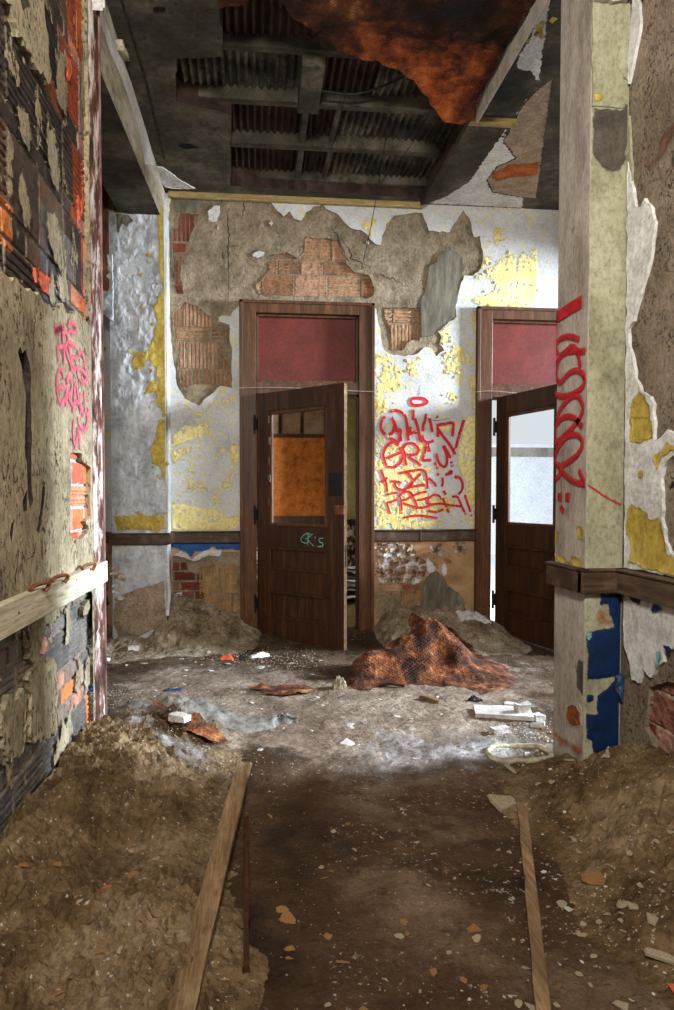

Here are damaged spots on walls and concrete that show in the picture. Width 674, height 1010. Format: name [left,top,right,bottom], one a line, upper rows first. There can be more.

flaking render [0,0,558,539]
peeling [591,0,674,577]
flaking render [110,543,240,636]
peeling [347,519,355,575]
flaking render [374,541,469,619]
flaking render [0,592,90,834]
peeling [564,594,674,775]